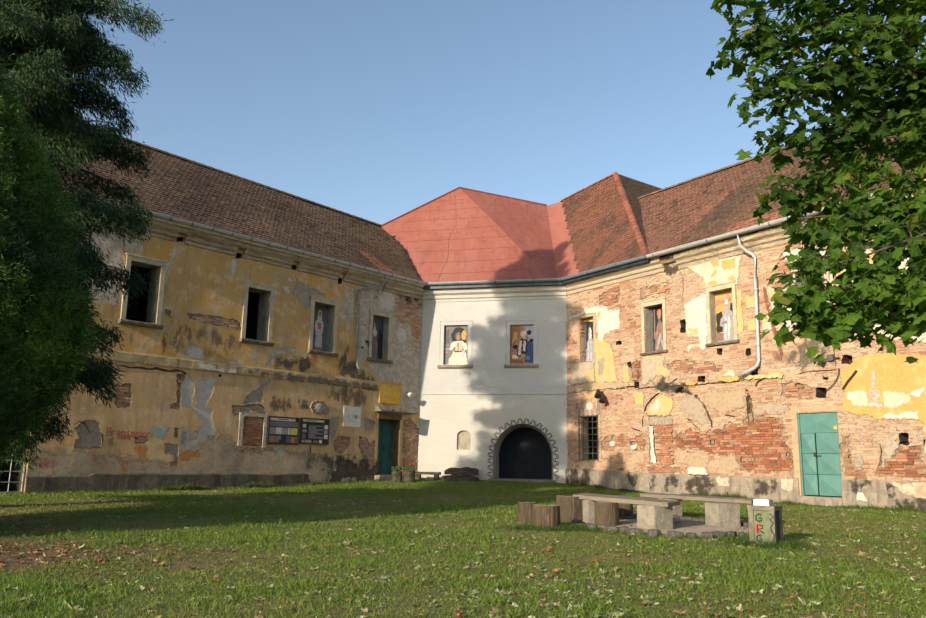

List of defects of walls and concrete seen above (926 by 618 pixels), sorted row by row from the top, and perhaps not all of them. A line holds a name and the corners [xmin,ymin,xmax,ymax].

peeling [873,325,926,343]
crack [117,365,187,374]
spalling [338,278,422,470]
spalling [568,256,828,491]
peeling [164,344,296,468]
spalling [73,420,104,449]
peeling [839,352,926,499]
leakage [25,434,378,483]
leakage [665,475,714,495]
leakage [755,479,776,495]
leakage [850,478,871,493]
leakage [886,484,926,511]